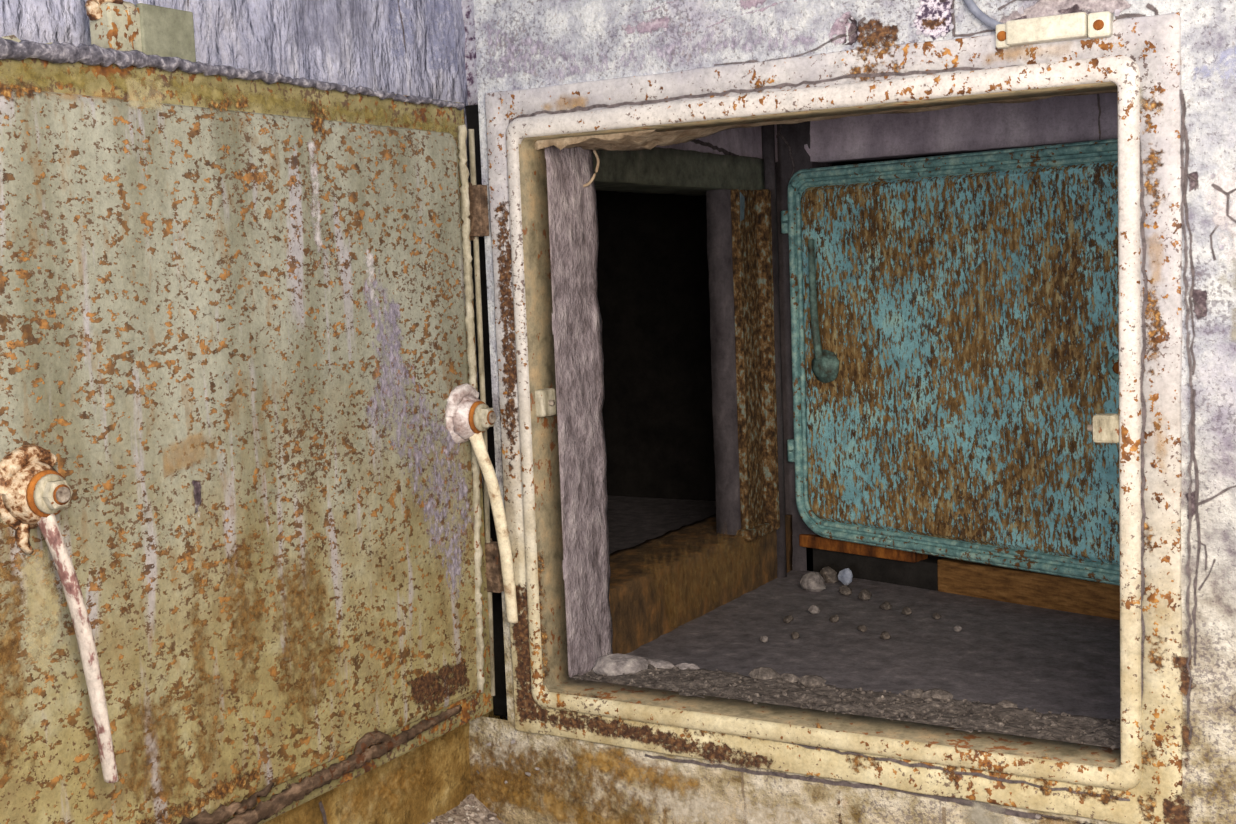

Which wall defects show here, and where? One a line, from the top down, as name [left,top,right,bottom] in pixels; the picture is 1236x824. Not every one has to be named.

rust [847,18,904,81]
rust [1140,89,1163,133]
rust [1142,148,1166,220]
rust [494,201,519,483]
crack [1180,89,1236,740]
rust [799,534,941,591]
rust [406,658,469,711]
rust [512,551,773,770]
rust [1145,636,1196,696]
leakage [468,740,699,824]
rust [1068,784,1125,805]
rust [1138,791,1193,824]